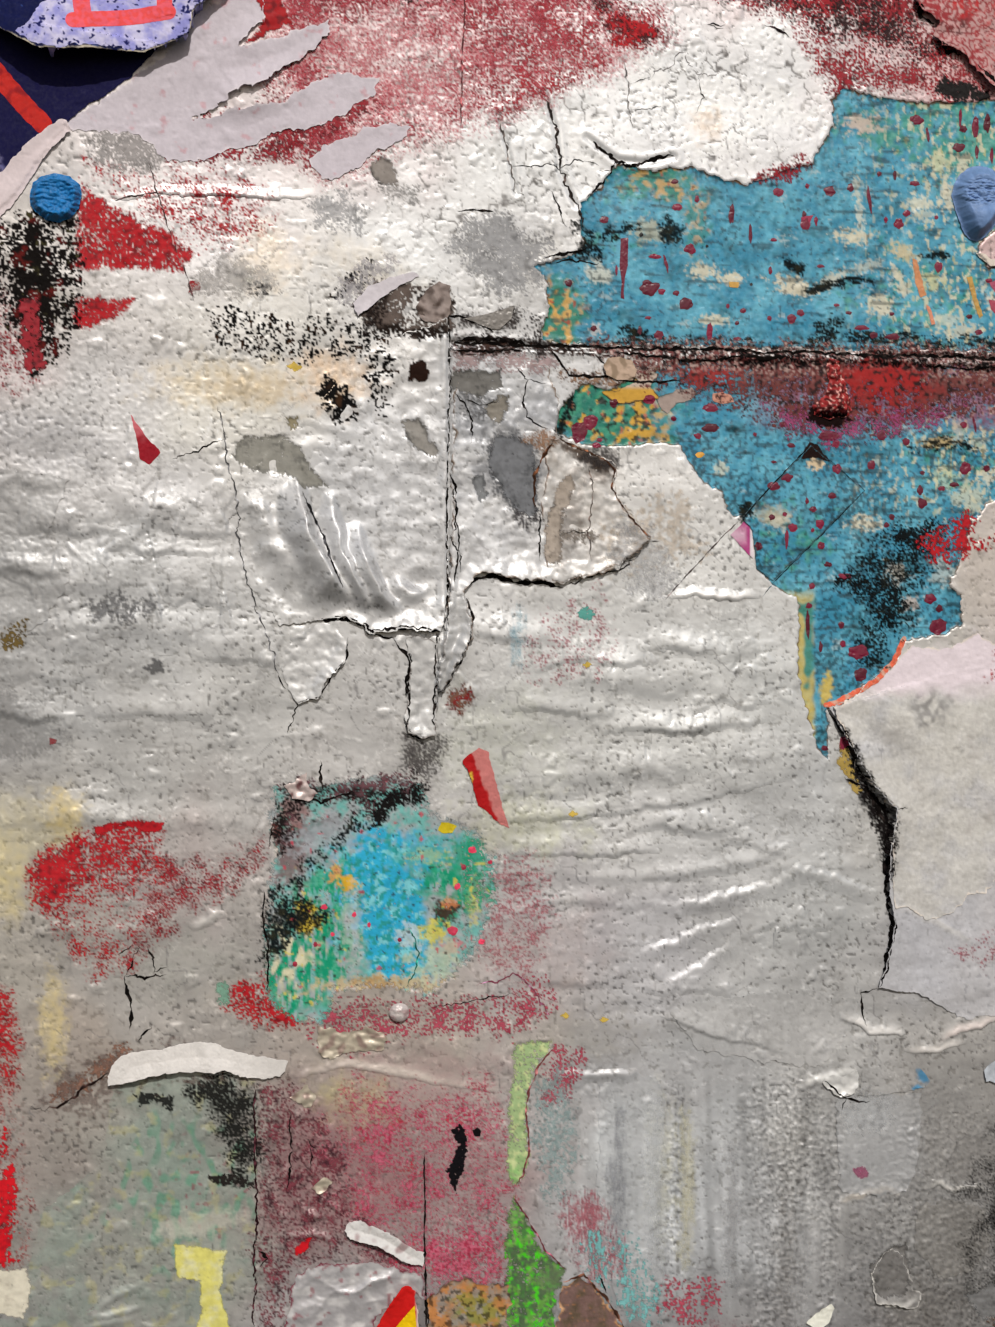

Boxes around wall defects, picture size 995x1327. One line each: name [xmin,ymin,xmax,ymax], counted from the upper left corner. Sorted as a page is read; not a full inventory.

peeling [370,156,398,187]
peeling [534,89,995,759]
crack [173,306,995,739]
peeling [267,821,284,873]
peeling [438,822,457,833]
crack [827,708,905,1026]
peeling [853,1007,995,1054]
peeling [984,1061,995,1083]